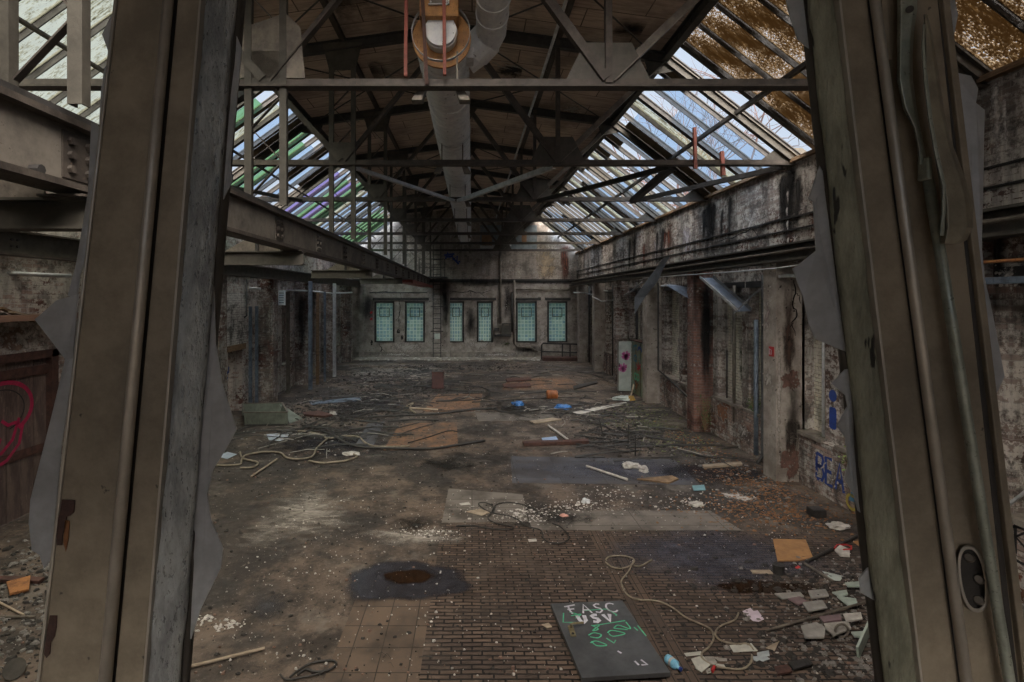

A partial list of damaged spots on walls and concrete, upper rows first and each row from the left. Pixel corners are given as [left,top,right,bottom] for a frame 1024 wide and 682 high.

leakage [683,197,757,254]
leakage [780,169,802,243]
leakage [441,283,449,323]